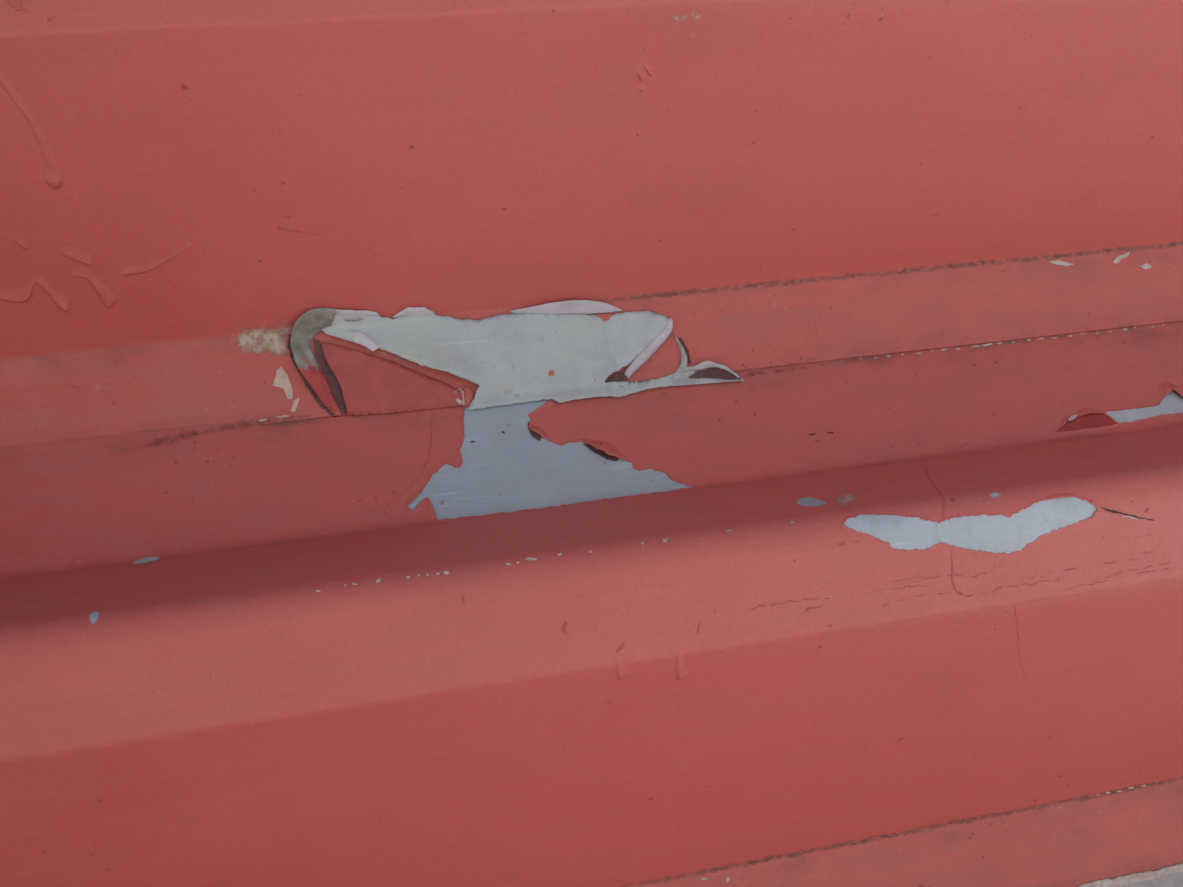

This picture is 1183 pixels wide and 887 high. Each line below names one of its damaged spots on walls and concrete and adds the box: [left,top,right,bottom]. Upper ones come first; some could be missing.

peeling [259,300,744,522]
peeling [1053,382,1183,434]
peeling [842,491,1101,557]